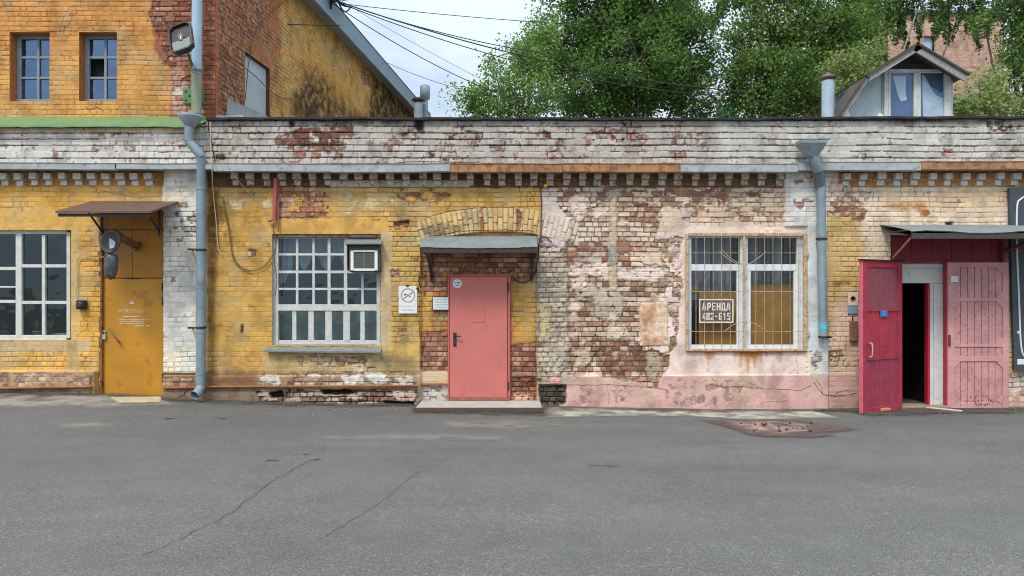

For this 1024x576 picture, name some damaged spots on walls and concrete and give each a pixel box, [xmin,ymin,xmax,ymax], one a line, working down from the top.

peeling [150,0,267,115]
water stain [289,75,423,131]
peeling [275,124,354,160]
peeling [261,185,331,220]
peeling [829,183,871,221]
peeling [424,185,813,406]
spalling [257,330,448,405]
crack [710,359,855,403]
spalling [811,351,845,367]